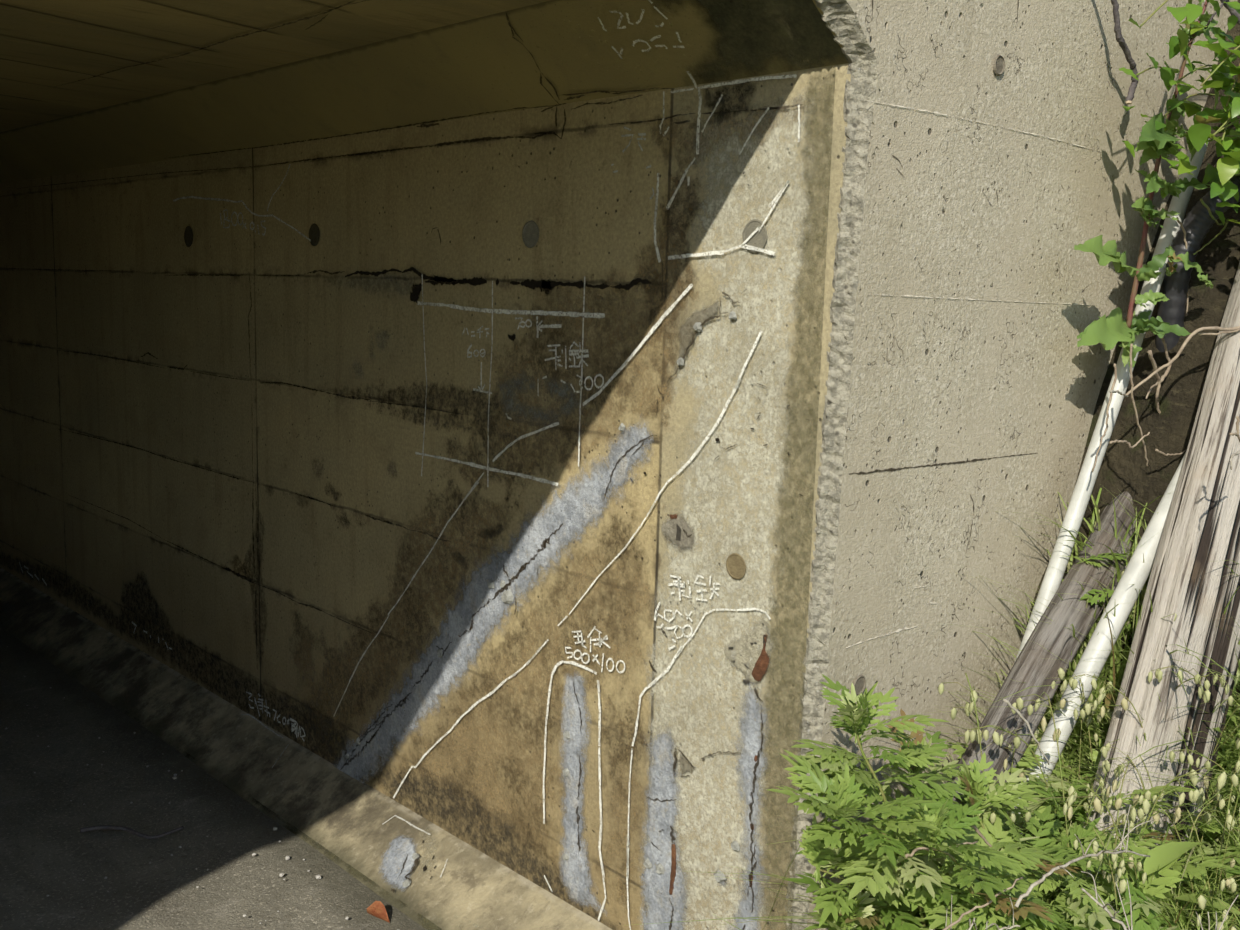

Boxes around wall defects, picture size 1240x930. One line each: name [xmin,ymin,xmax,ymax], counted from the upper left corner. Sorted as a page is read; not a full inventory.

leakage [0,0,848,765]
crack [60,429,254,483]
crack [366,515,451,542]